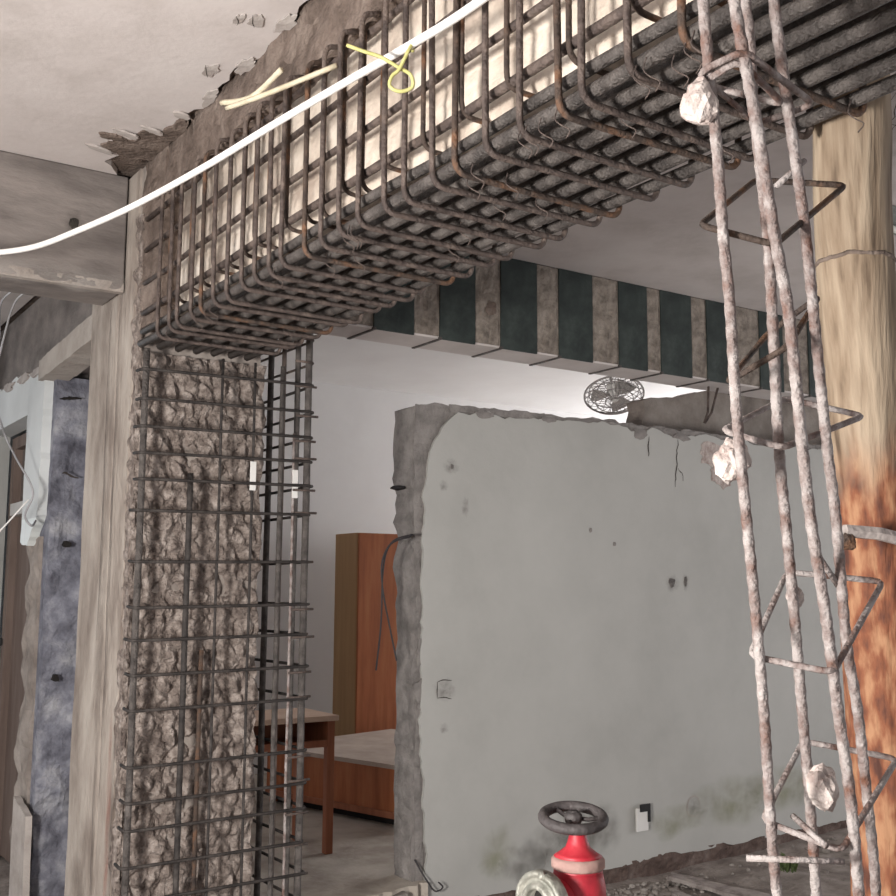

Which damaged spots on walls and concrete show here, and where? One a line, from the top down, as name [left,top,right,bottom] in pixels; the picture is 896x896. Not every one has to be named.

spalling [85,0,382,202]
spalling [414,272,437,336]
spalling [475,260,499,346]
spalling [537,265,557,355]
spalling [592,276,617,364]
spalling [647,288,659,371]
spalling [691,297,705,378]
spalling [736,306,759,386]
spalling [782,316,791,391]
spalling [796,319,808,394]
spalling [0,214,267,896]
spalling [393,404,733,882]